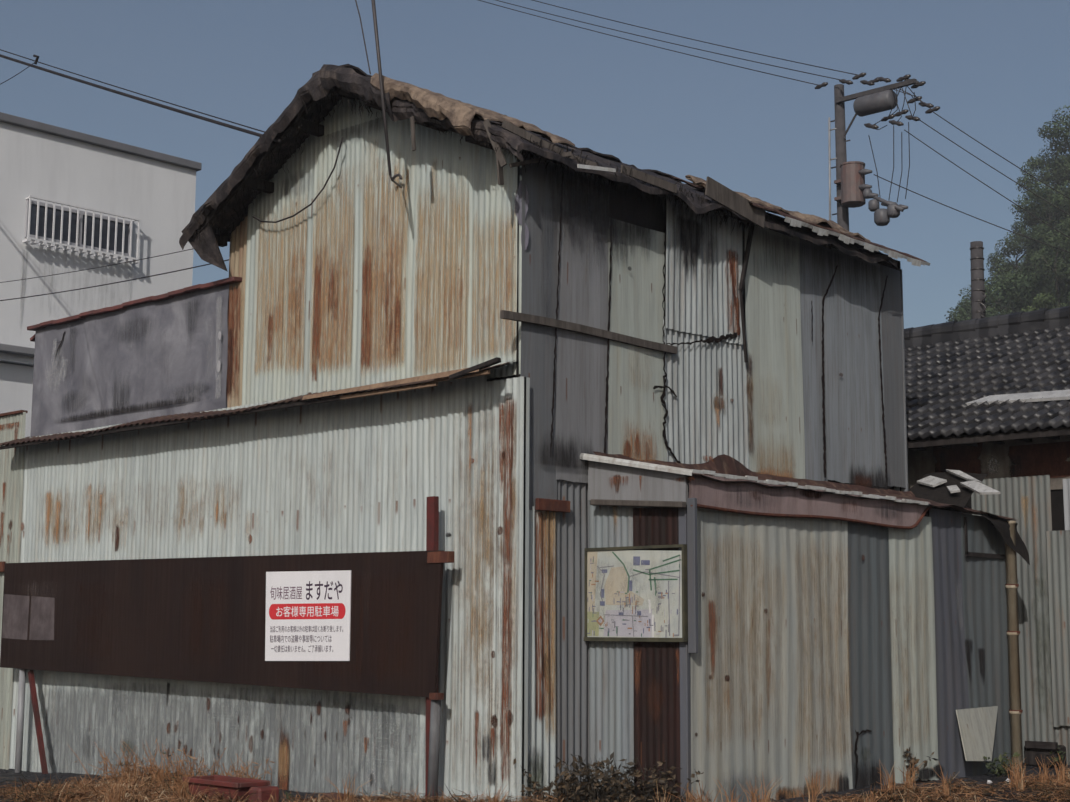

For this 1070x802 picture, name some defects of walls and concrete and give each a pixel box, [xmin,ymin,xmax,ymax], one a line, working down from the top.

damp [61,386,200,423]
rust [227,173,516,408]
crack [653,236,737,463]
rust [725,249,740,335]
rust [46,493,66,538]
rust [469,398,515,782]
rust [702,592,729,708]